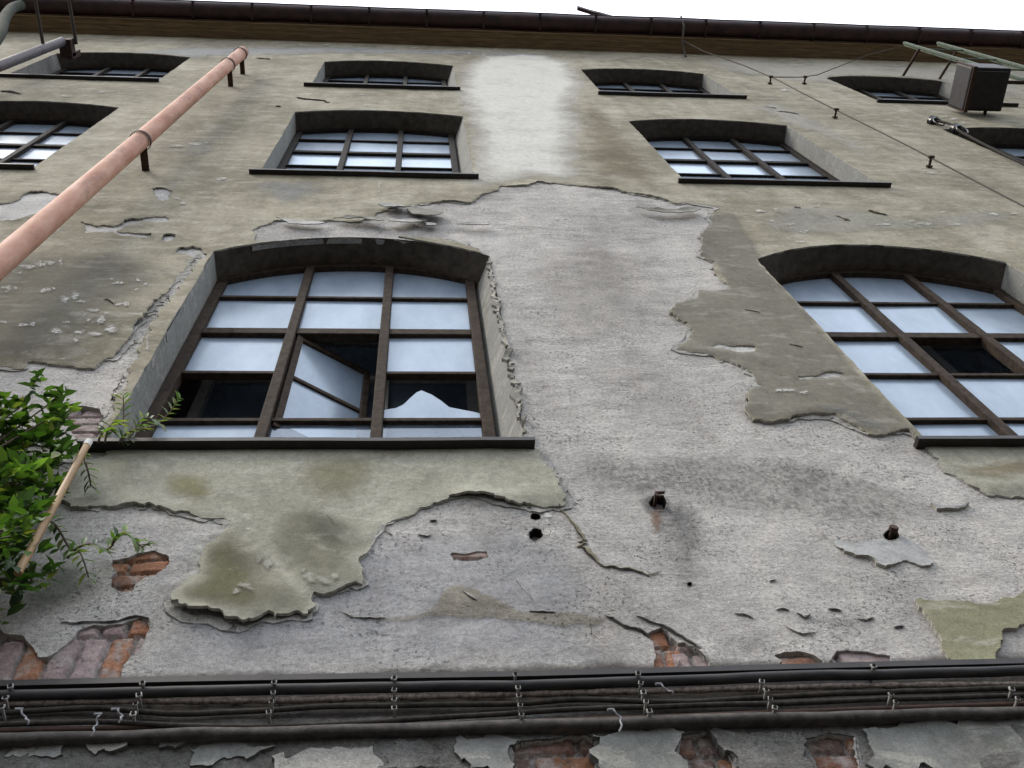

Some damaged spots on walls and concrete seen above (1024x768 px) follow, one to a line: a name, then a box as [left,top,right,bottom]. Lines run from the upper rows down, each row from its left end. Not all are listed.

leakage [145,48,579,180]
peeling [0,182,1024,680]
crack [559,504,660,575]
peeling [152,711,734,724]
peeling [0,735,485,768]
flaking render [499,732,616,768]
flaking render [675,730,738,768]
peeling [723,725,898,768]
peeling [980,754,1020,768]